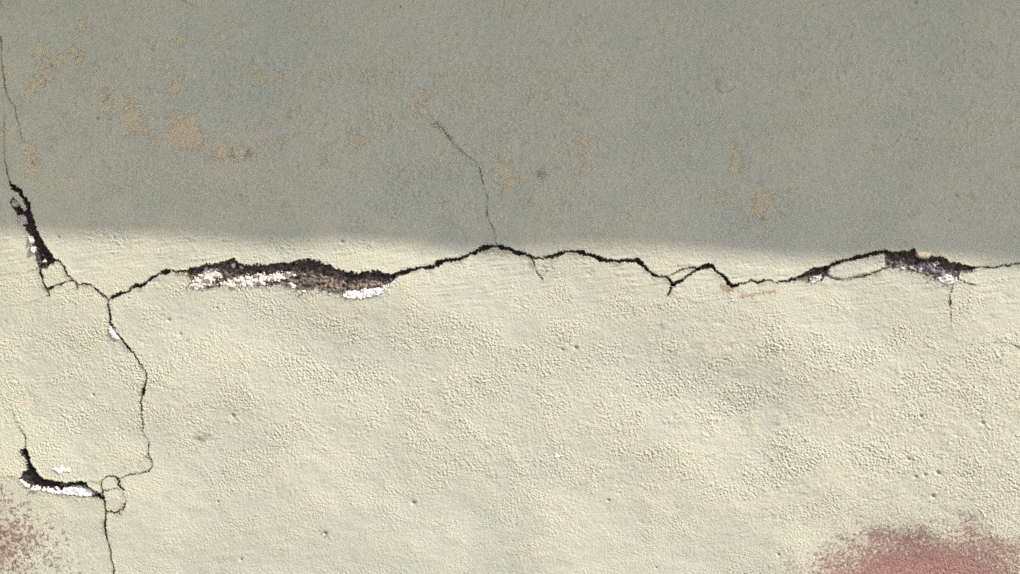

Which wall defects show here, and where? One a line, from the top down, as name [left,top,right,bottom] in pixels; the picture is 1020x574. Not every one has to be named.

flaking render [10,184,56,269]
flaking render [184,258,398,300]
crack [394,212,794,296]
flaking render [794,266,829,283]
crack [826,250,887,280]
flaking render [884,248,975,285]
crack [949,263,1020,309]
crack [38,259,184,574]
flaking render [19,448,105,500]